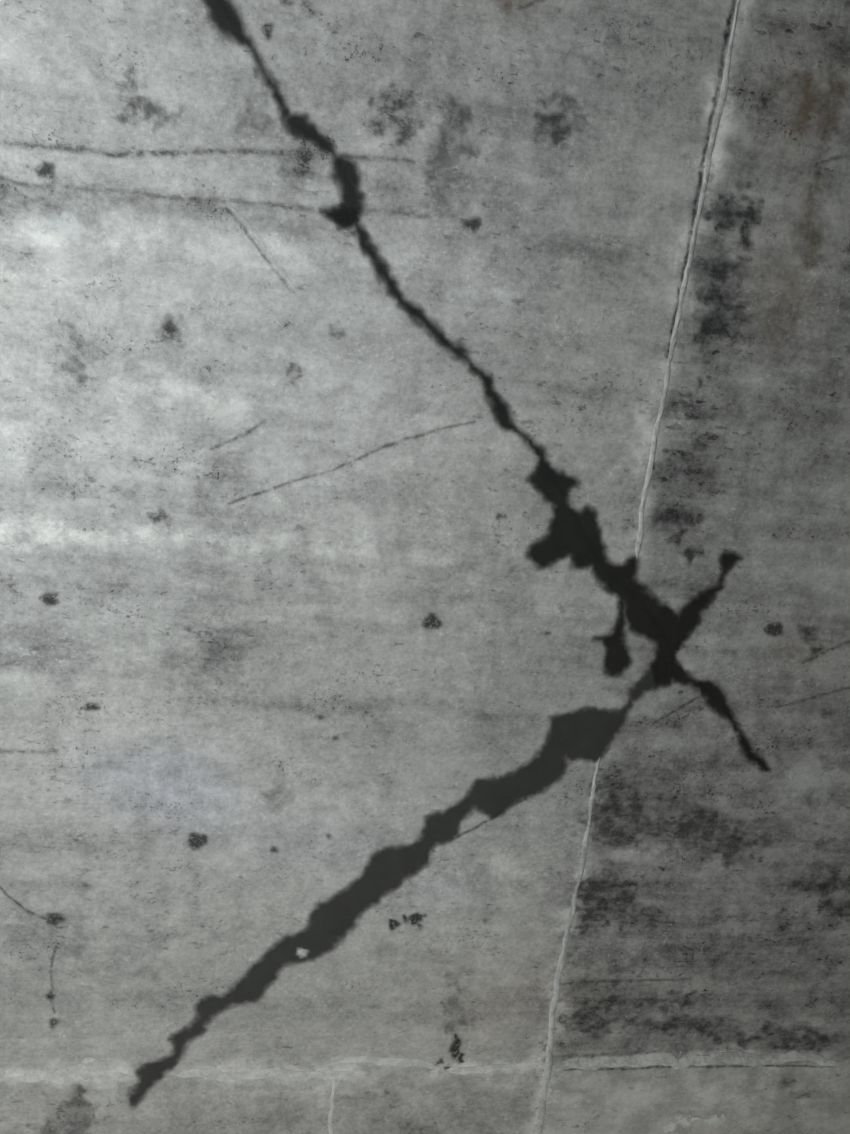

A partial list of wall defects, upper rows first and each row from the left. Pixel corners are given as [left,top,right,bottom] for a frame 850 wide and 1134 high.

crack [721,4,735,64]
crack [668,98,716,352]
water stain [129,0,769,1106]
water stain [737,1023,829,1049]